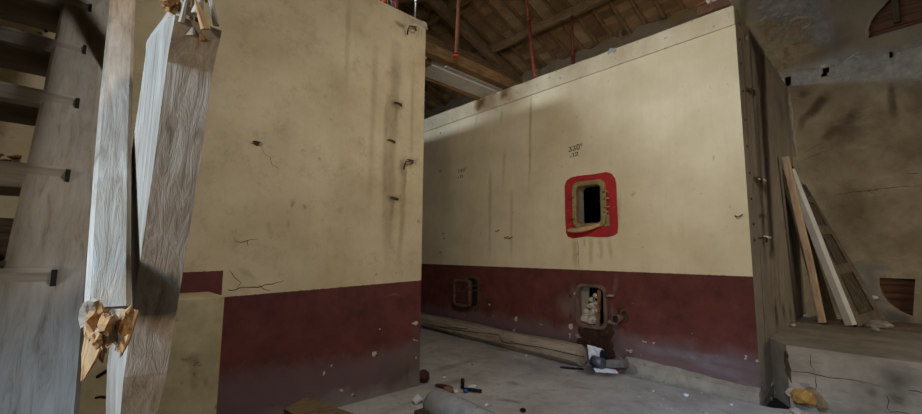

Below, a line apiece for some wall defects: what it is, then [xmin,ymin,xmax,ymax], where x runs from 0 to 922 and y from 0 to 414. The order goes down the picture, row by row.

crack [228,271,278,291]
crack [760,256,922,414]